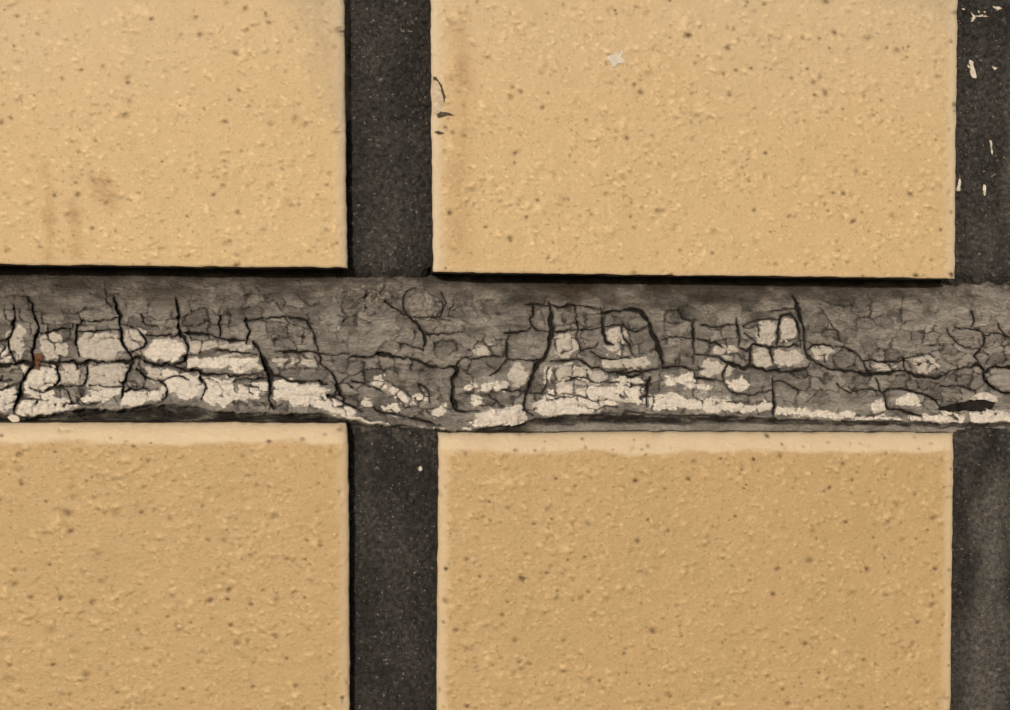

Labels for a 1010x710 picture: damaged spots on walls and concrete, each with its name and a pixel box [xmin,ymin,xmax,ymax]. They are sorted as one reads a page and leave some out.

crack [0,267,1010,434]
spalling [935,392,998,412]
peeling [475,407,527,426]